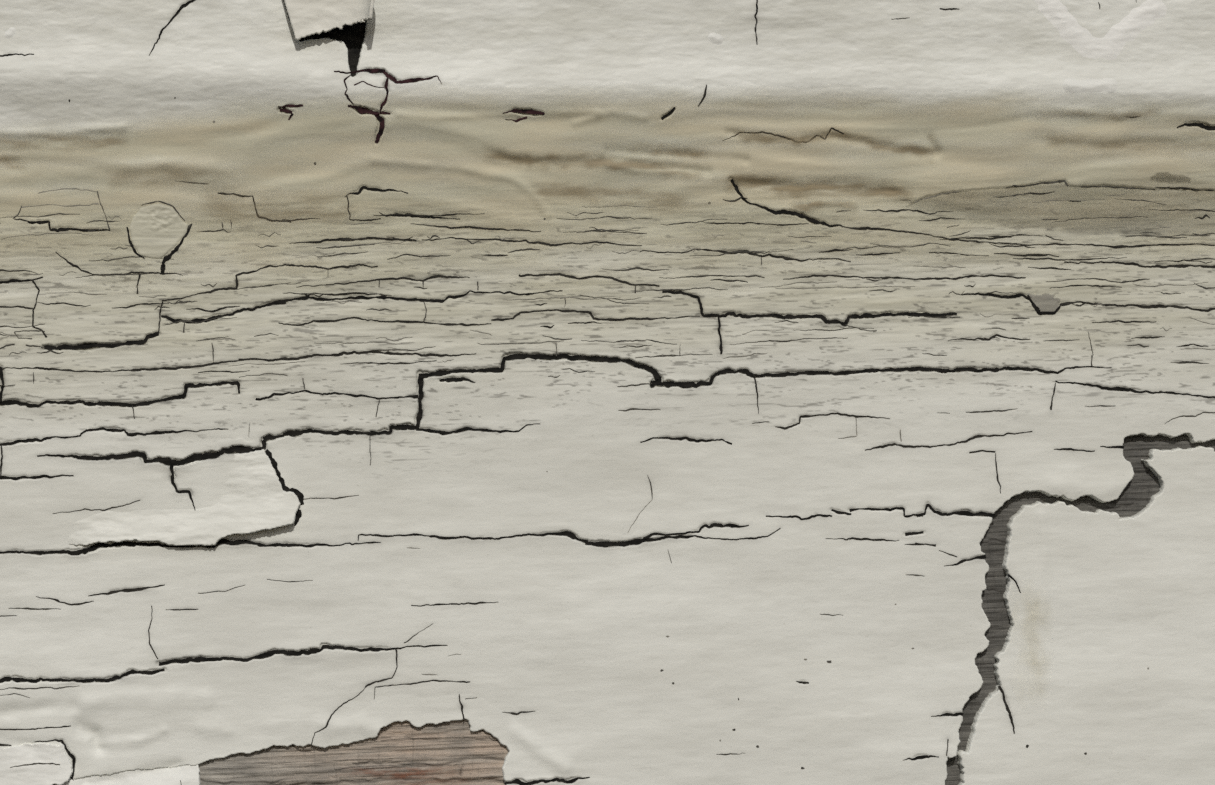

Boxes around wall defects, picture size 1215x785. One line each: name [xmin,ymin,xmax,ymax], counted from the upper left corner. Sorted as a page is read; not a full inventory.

crack [0,51,34,59]
crack [149,0,195,55]
peeling [283,0,375,77]
crack [752,0,760,44]
crack [334,69,442,143]
crack [0,179,1215,785]
peeling [0,719,508,785]